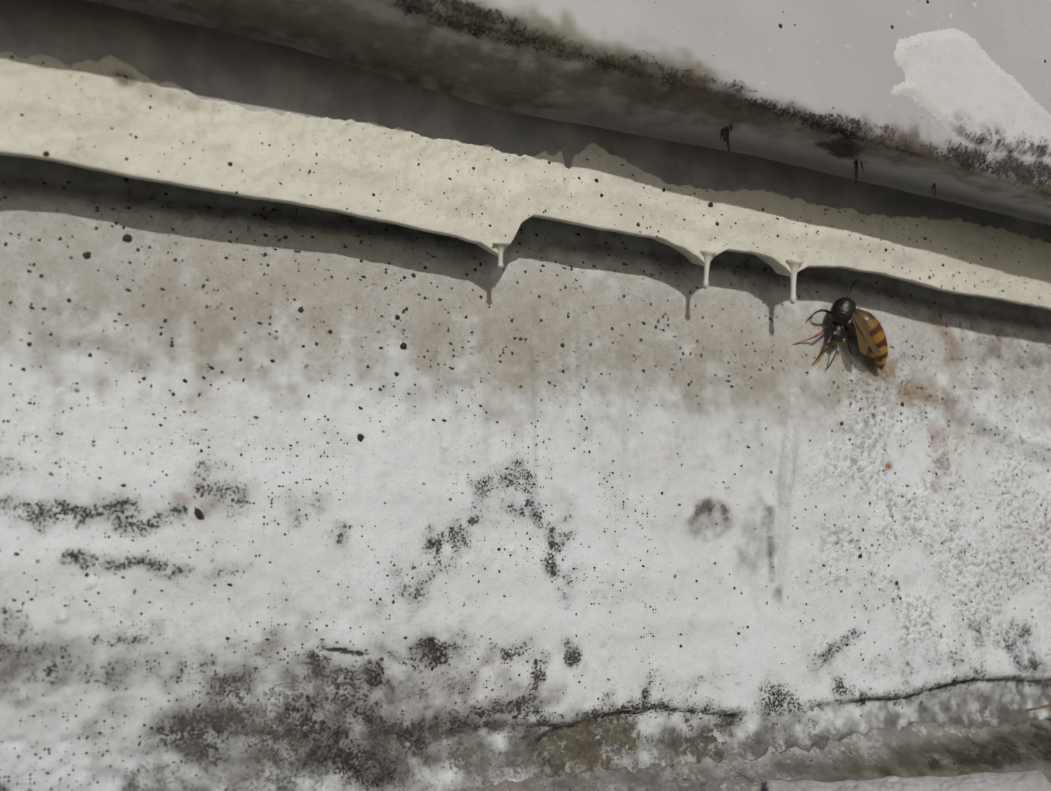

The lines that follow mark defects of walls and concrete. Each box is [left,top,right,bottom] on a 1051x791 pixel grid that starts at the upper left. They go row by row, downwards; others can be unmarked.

leakage [174,0,1051,199]
leakage [0,381,1051,791]
crack [431,707,737,741]
crack [813,678,1051,707]